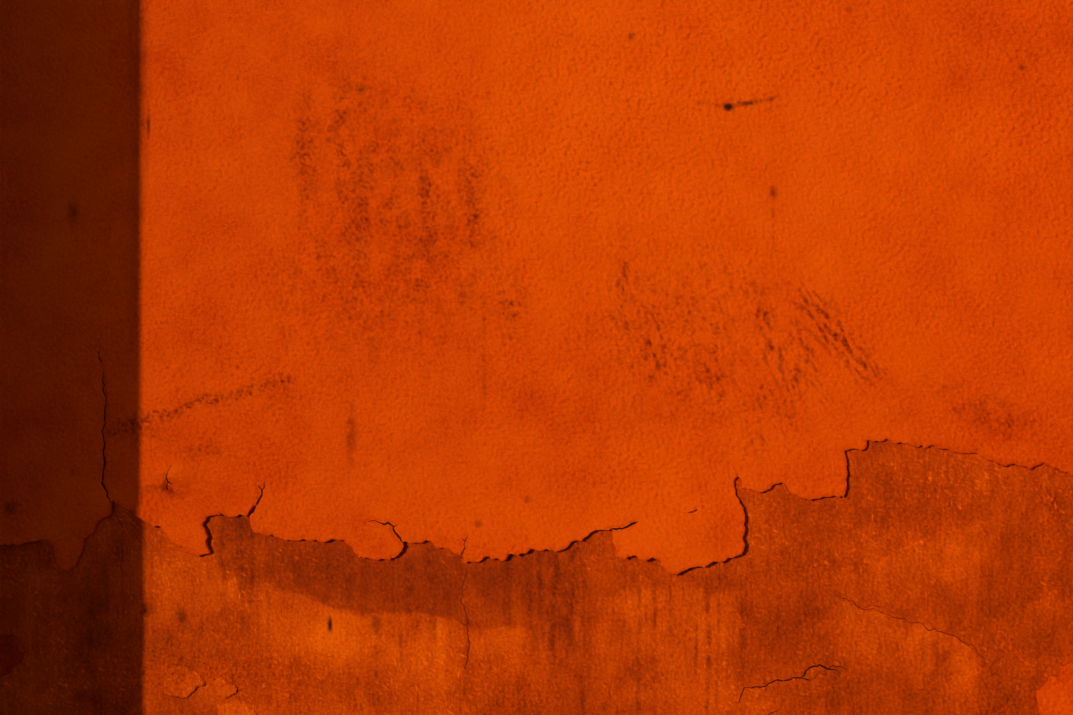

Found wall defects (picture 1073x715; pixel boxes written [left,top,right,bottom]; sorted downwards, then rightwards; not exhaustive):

crack [98,350,124,598]
peeling [0,439,1073,715]
crack [739,664,854,715]